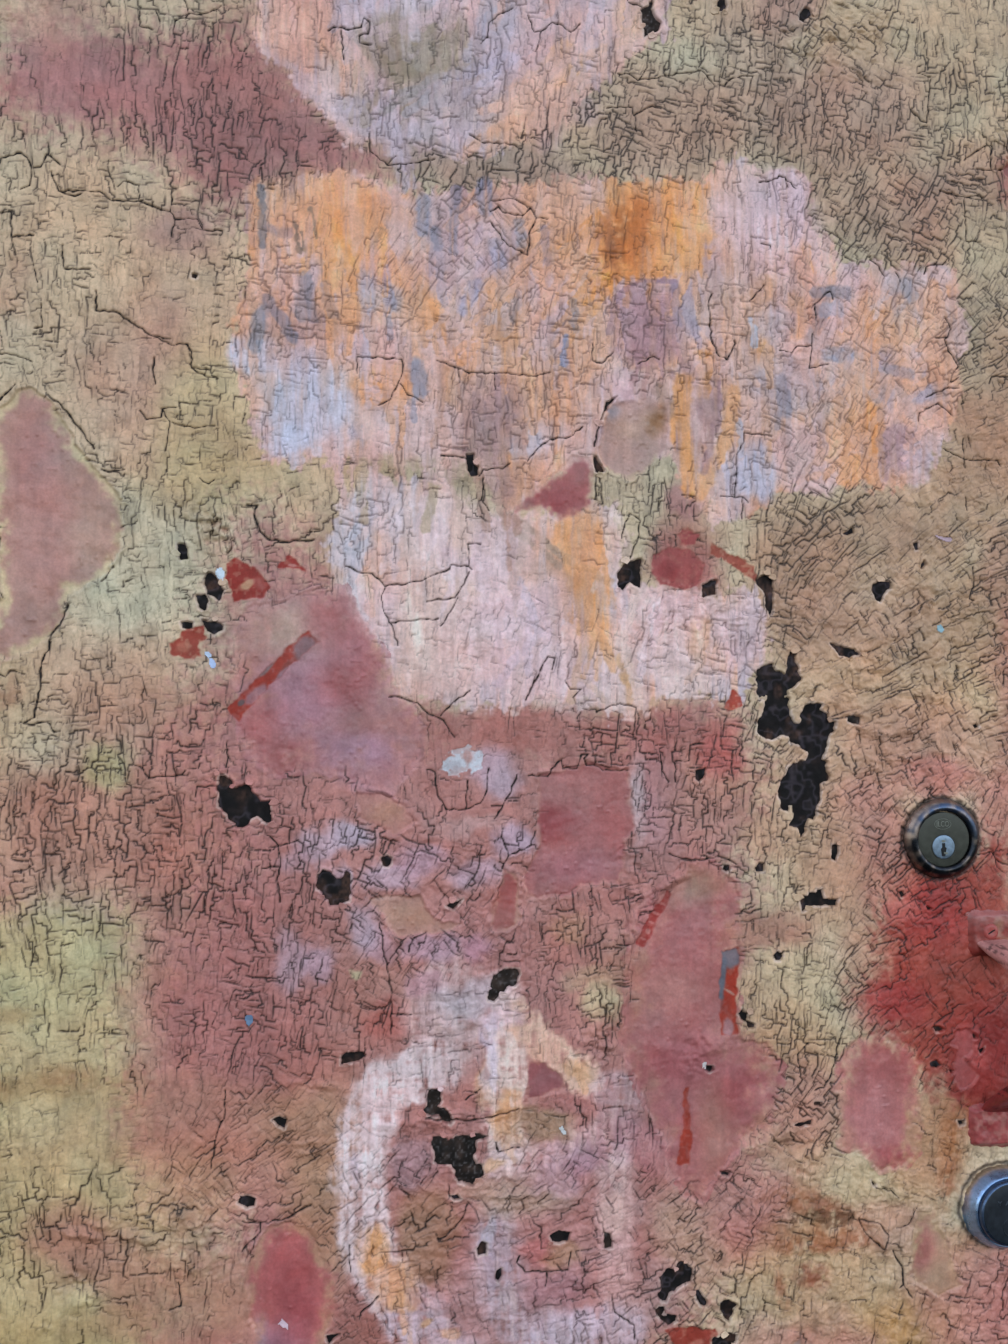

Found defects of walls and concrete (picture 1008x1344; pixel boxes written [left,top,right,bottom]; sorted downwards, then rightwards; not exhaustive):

crack [329,21,369,60]
crack [0,144,221,450]
crack [248,505,313,543]
crack [346,543,478,646]
peeling [615,557,641,592]
crack [0,605,69,732]
peeling [182,568,430,840]
peeling [756,646,860,841]
crack [426,754,627,869]
peeling [417,1086,489,1199]
peeling [240,1219,341,1344]
peeling [656,1259,739,1344]